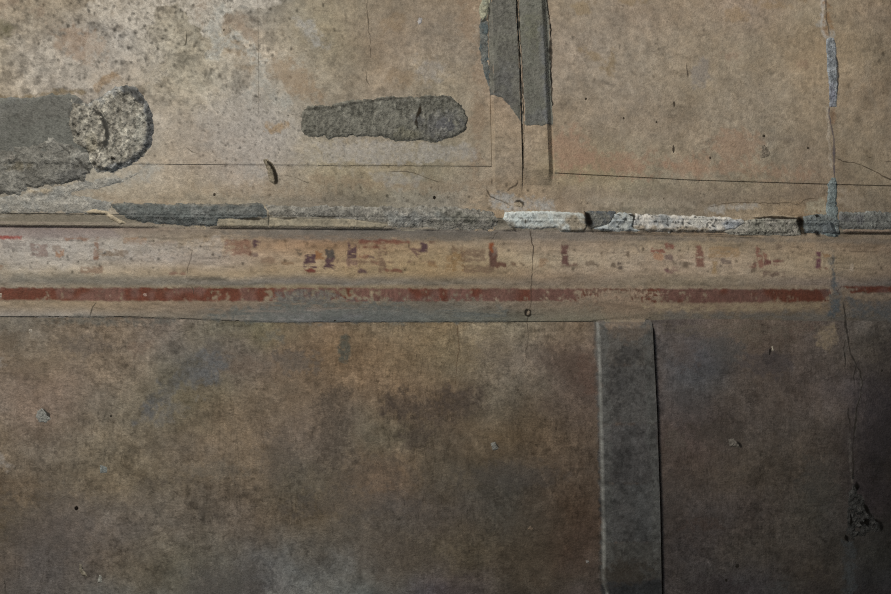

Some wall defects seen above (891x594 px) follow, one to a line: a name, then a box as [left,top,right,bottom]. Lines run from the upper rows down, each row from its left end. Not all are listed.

crack [811,0,891,180]
flaking render [503,200,801,236]
crack [842,304,864,485]